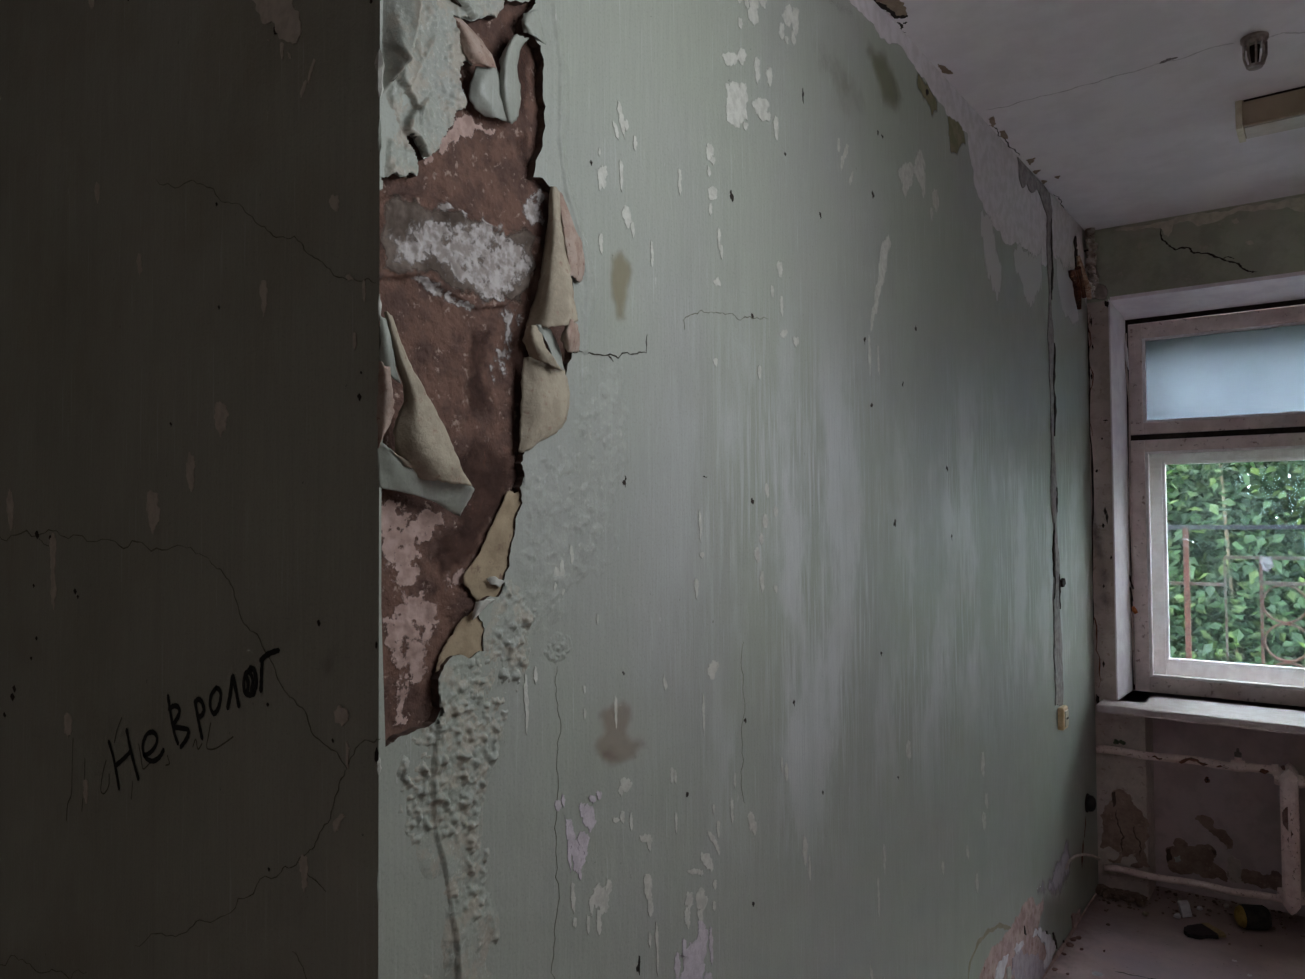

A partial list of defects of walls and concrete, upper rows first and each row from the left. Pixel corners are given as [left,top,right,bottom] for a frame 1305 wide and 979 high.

peeling [252,0,302,60]
peeling [779,4,799,46]
peeling [874,0,908,19]
peeling [721,48,779,141]
flaking render [1073,227,1099,298]
crack [1160,221,1255,273]
flaking render [370,0,603,775]
crack [0,529,381,947]
peeling [554,791,612,935]
flaking render [1100,789,1150,868]
flaking render [1165,815,1282,890]
flaking render [979,897,1065,979]